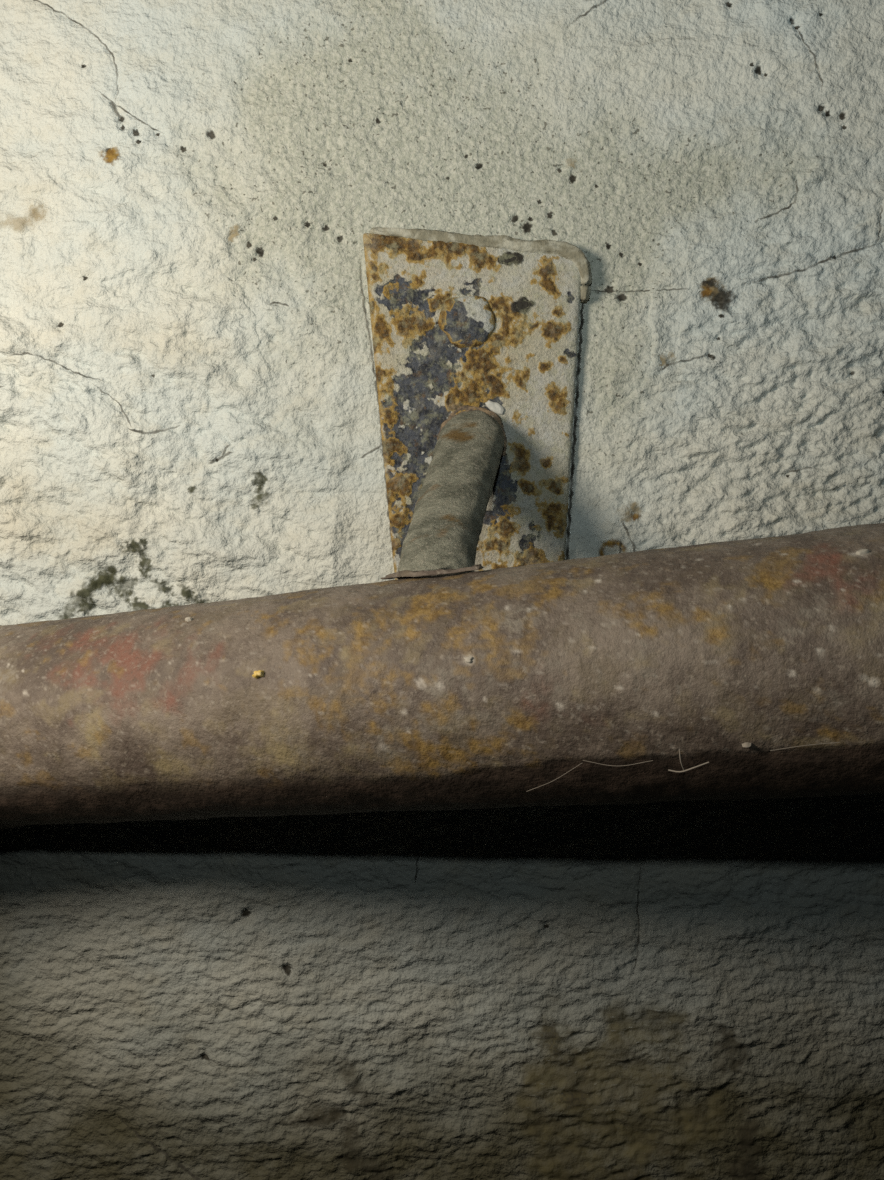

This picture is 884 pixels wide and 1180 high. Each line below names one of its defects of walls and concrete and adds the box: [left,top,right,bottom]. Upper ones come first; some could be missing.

crack [34,0,117,67]
crack [103,95,156,144]
crack [761,213,881,281]
crack [13,352,161,433]
damp [60,539,204,619]